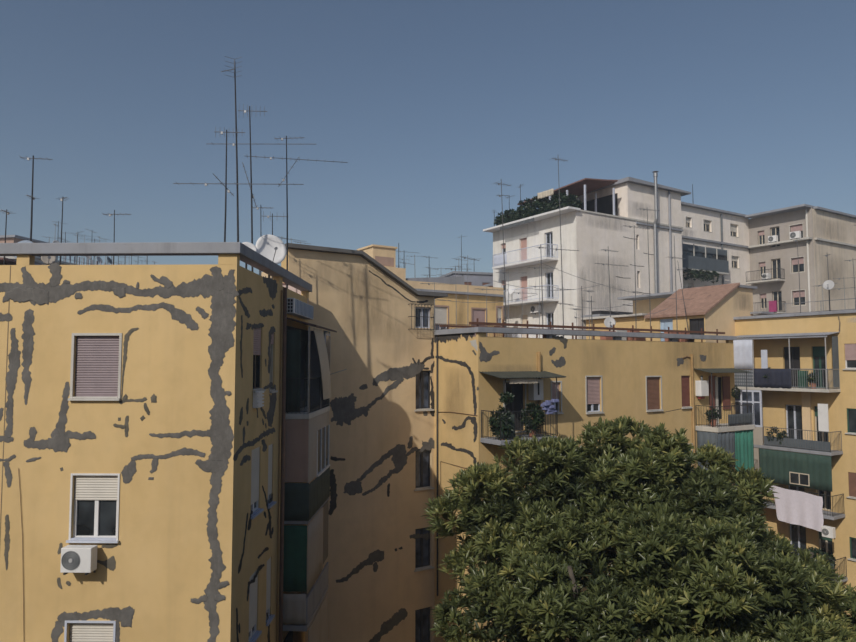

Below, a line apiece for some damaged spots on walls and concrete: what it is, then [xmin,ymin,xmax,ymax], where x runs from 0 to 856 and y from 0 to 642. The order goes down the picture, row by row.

crack [369,270,428,304]